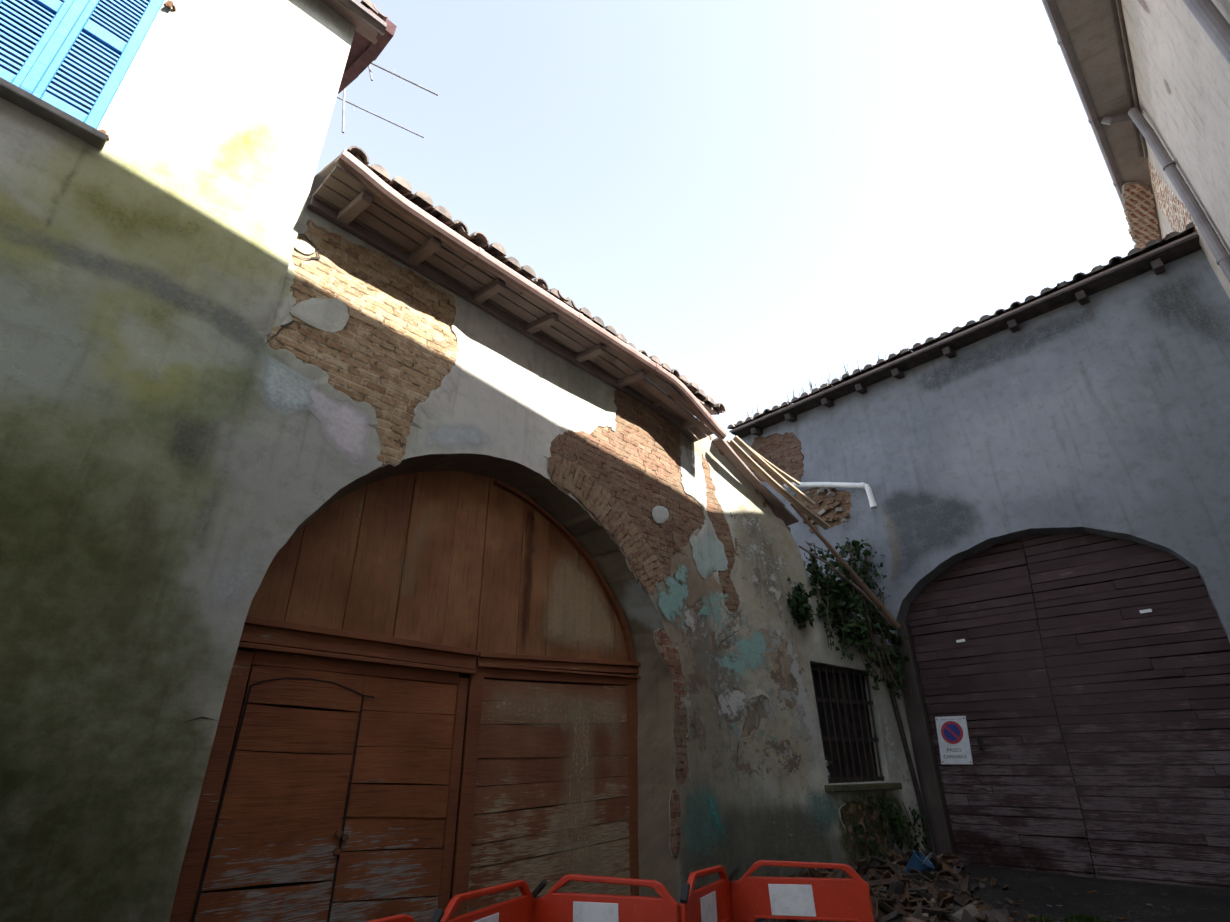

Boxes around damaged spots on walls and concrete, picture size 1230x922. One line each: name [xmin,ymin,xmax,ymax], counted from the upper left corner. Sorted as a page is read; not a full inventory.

spalling [251,212,469,468]
spalling [542,383,832,857]
spalling [745,427,859,533]
damp [888,492,972,573]